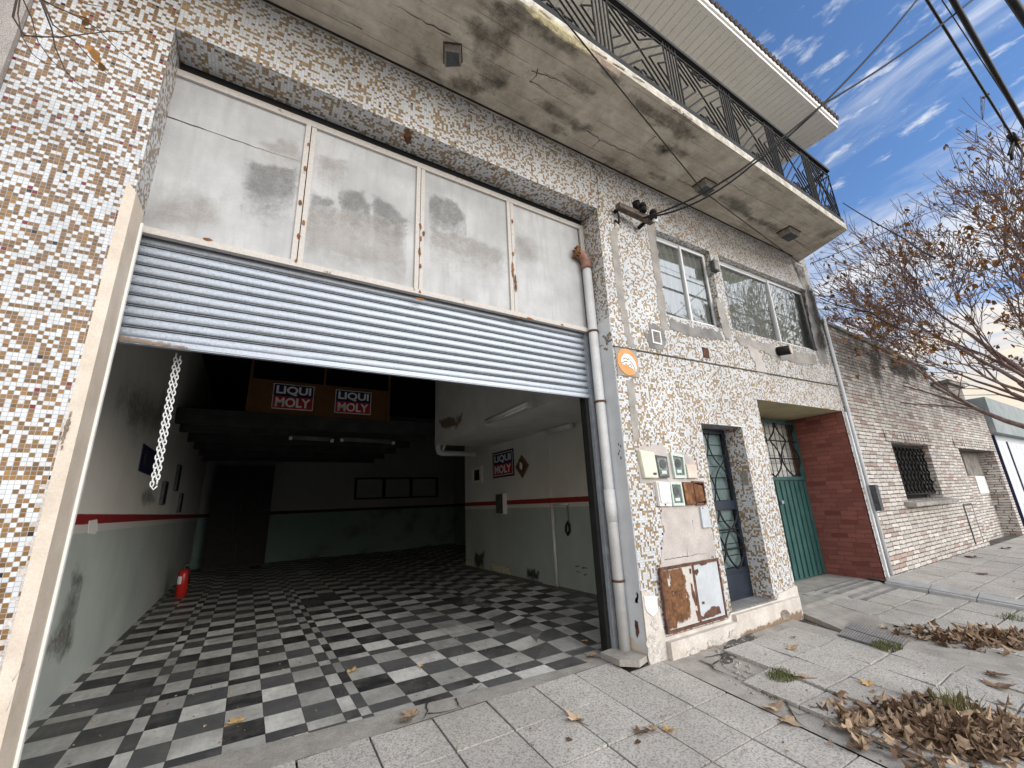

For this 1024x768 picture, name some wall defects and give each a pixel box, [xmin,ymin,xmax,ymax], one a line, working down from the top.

corrosion [660,563,721,629]